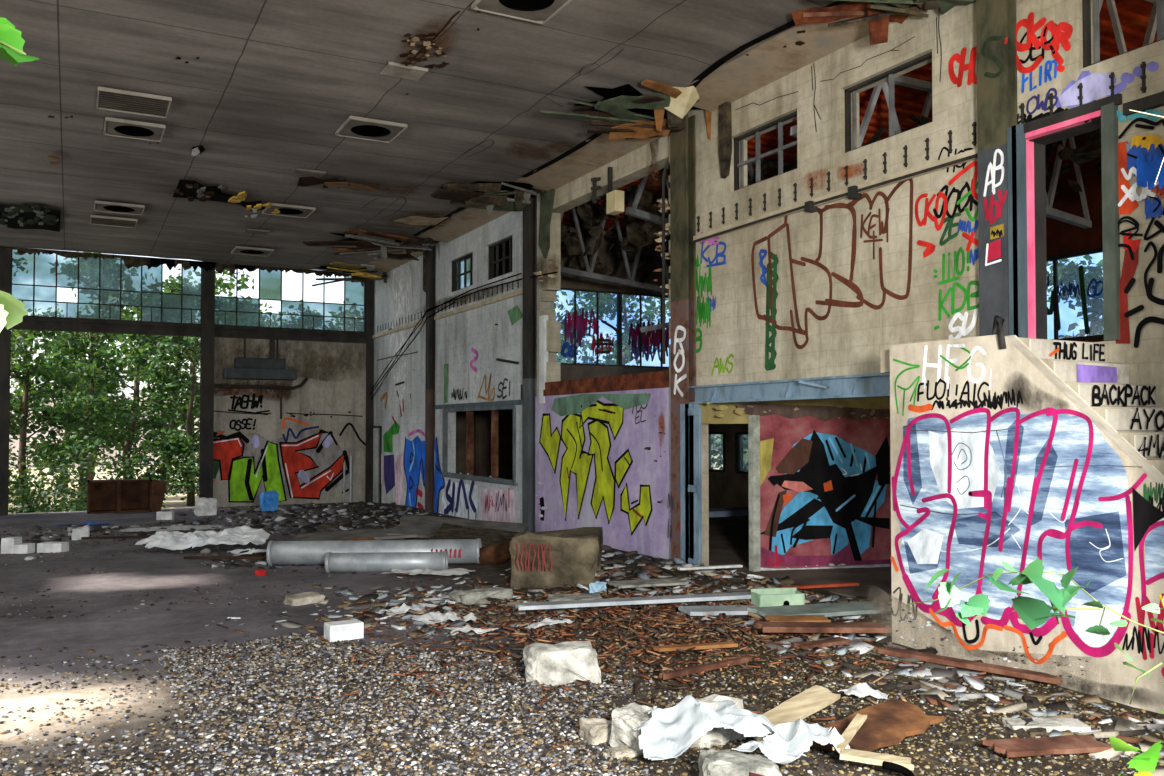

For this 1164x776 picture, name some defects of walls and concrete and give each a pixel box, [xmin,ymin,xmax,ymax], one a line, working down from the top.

peeling [399,11,461,69]
peeling [664,86,699,119]
peeling [228,191,280,218]
peeling [393,213,448,228]